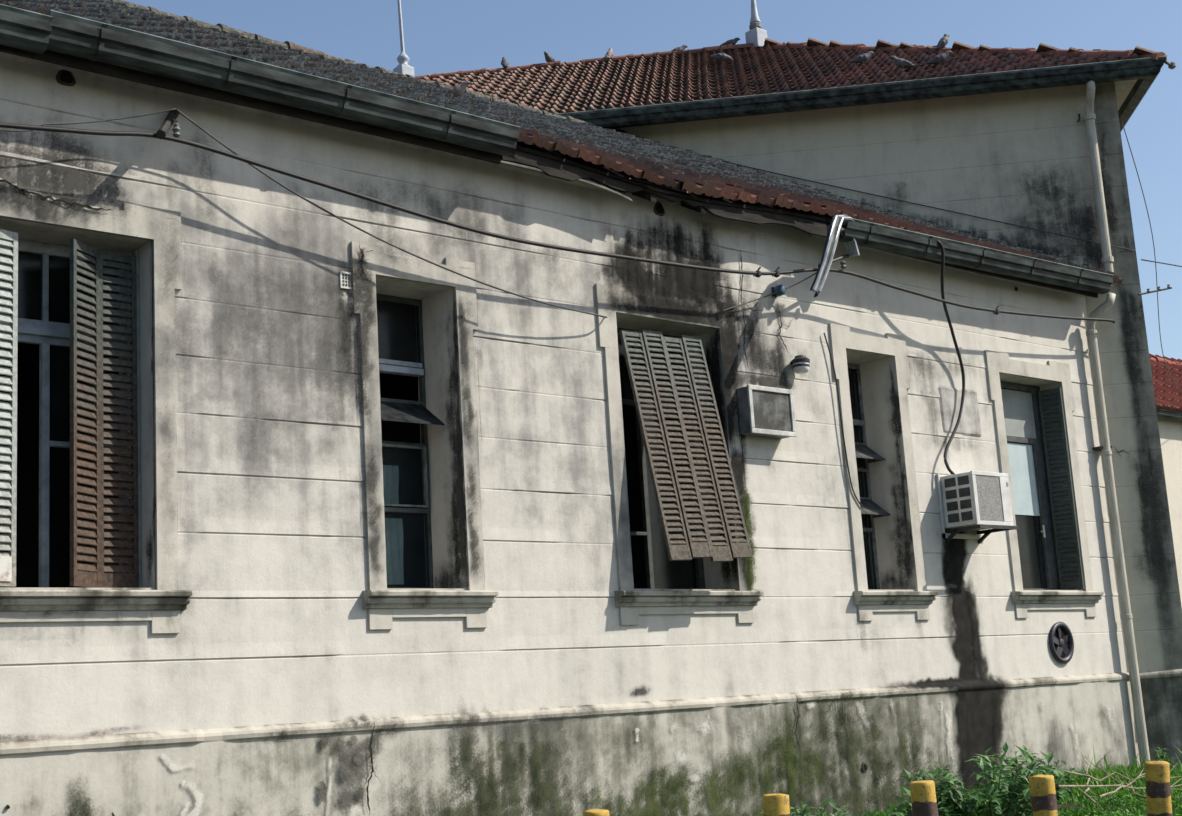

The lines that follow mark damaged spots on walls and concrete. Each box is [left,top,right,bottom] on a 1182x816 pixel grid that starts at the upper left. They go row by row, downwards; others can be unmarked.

damp [0,132,121,223]
damp [1121,292,1144,424]
damp [1136,443,1173,595]
damp [902,531,1008,793]
crack [366,723,379,816]
damp [346,716,404,751]
damp [471,716,552,733]